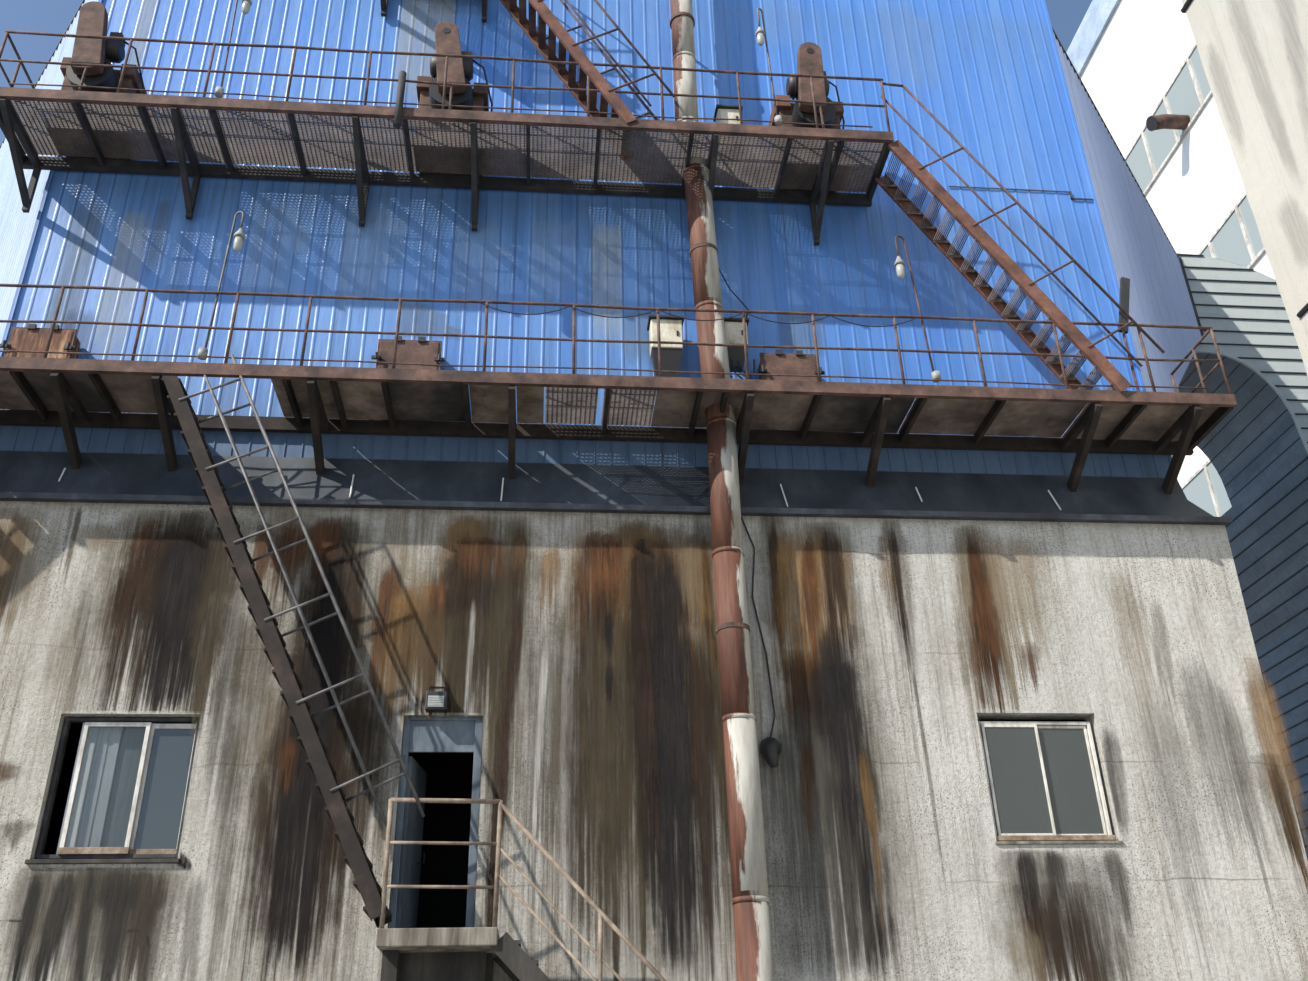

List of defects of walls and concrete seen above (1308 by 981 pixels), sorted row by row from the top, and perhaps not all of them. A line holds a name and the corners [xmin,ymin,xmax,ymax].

water stain [12,873,163,981]
water stain [106,525,231,719]
water stain [254,706,346,961]
water stain [255,520,383,832]
corrosion [368,520,526,927]
corrosion [532,657,548,866]
corrosion [540,553,558,617]
water stain [768,526,783,665]
corrosion [769,535,893,969]
corrosion [968,541,1037,713]
water stain [1018,852,1106,981]
corrosion [1250,676,1308,886]